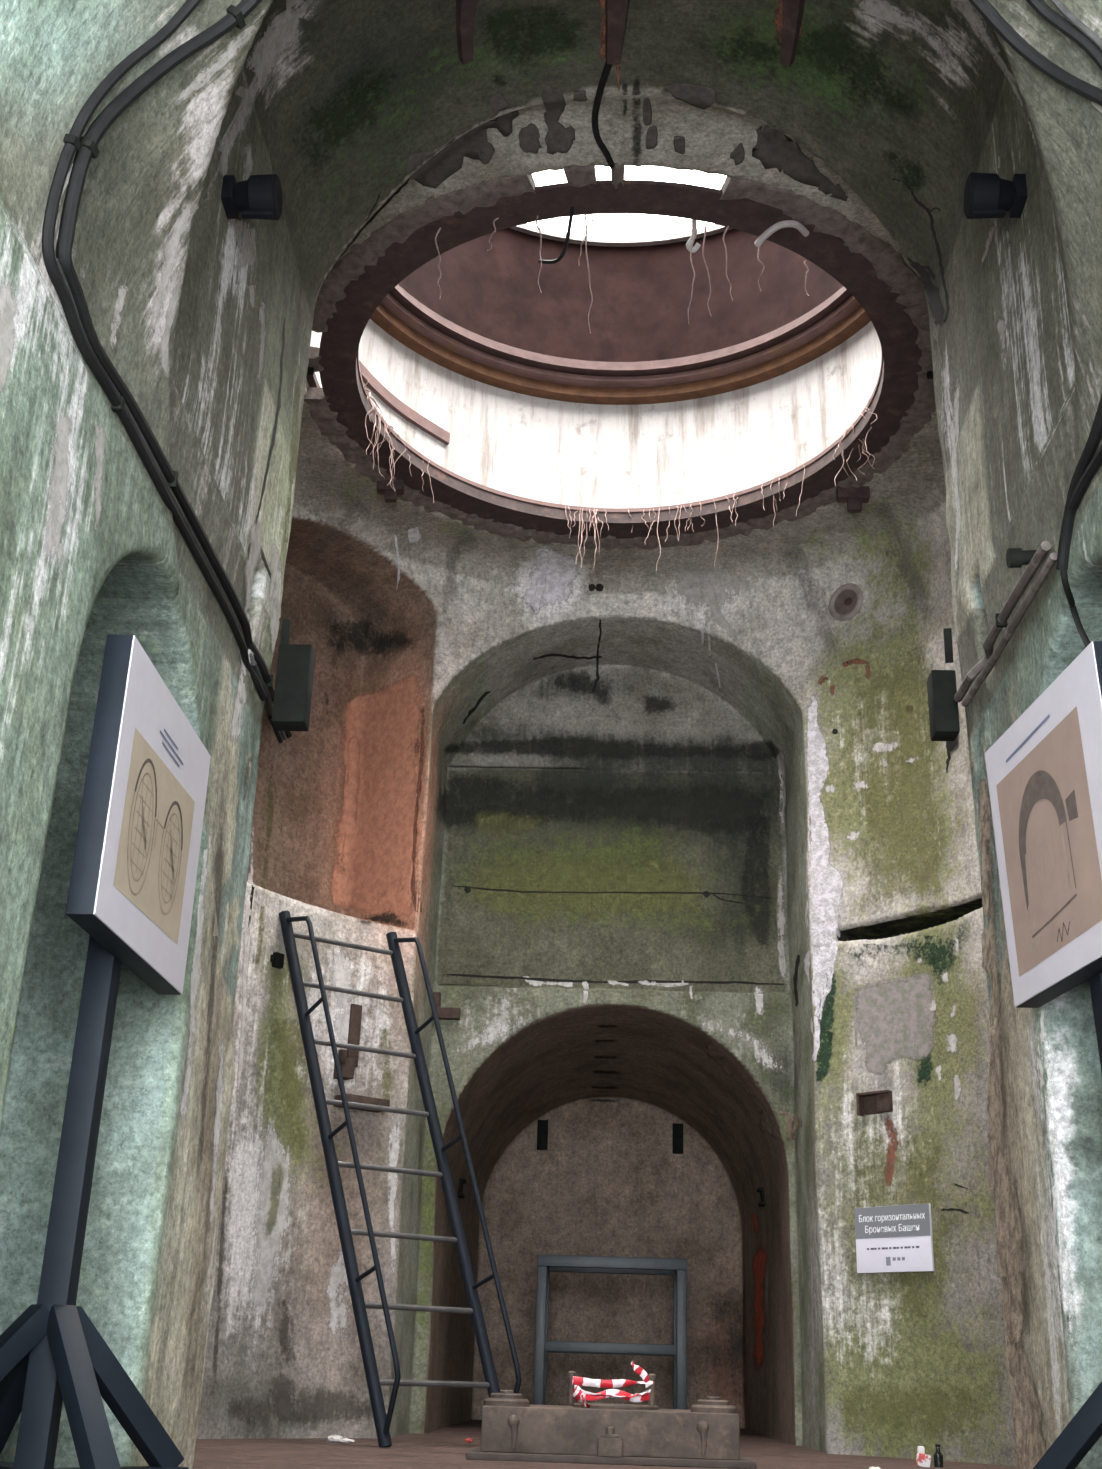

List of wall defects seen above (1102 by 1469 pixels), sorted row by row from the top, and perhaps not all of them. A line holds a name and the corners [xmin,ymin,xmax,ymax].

peeling [665,83,717,110]
peeling [643,98,685,154]
peeling [730,125,848,201]
crack [533,619,602,692]
crack [463,691,491,724]
water stain [554,672,609,703]
water stain [644,696,674,713]
water stain [437,737,787,977]
water stain [804,696,843,1061]
water stain [457,1020,519,1052]
water stain [710,1022,782,1069]
rust [880,1112,898,1186]